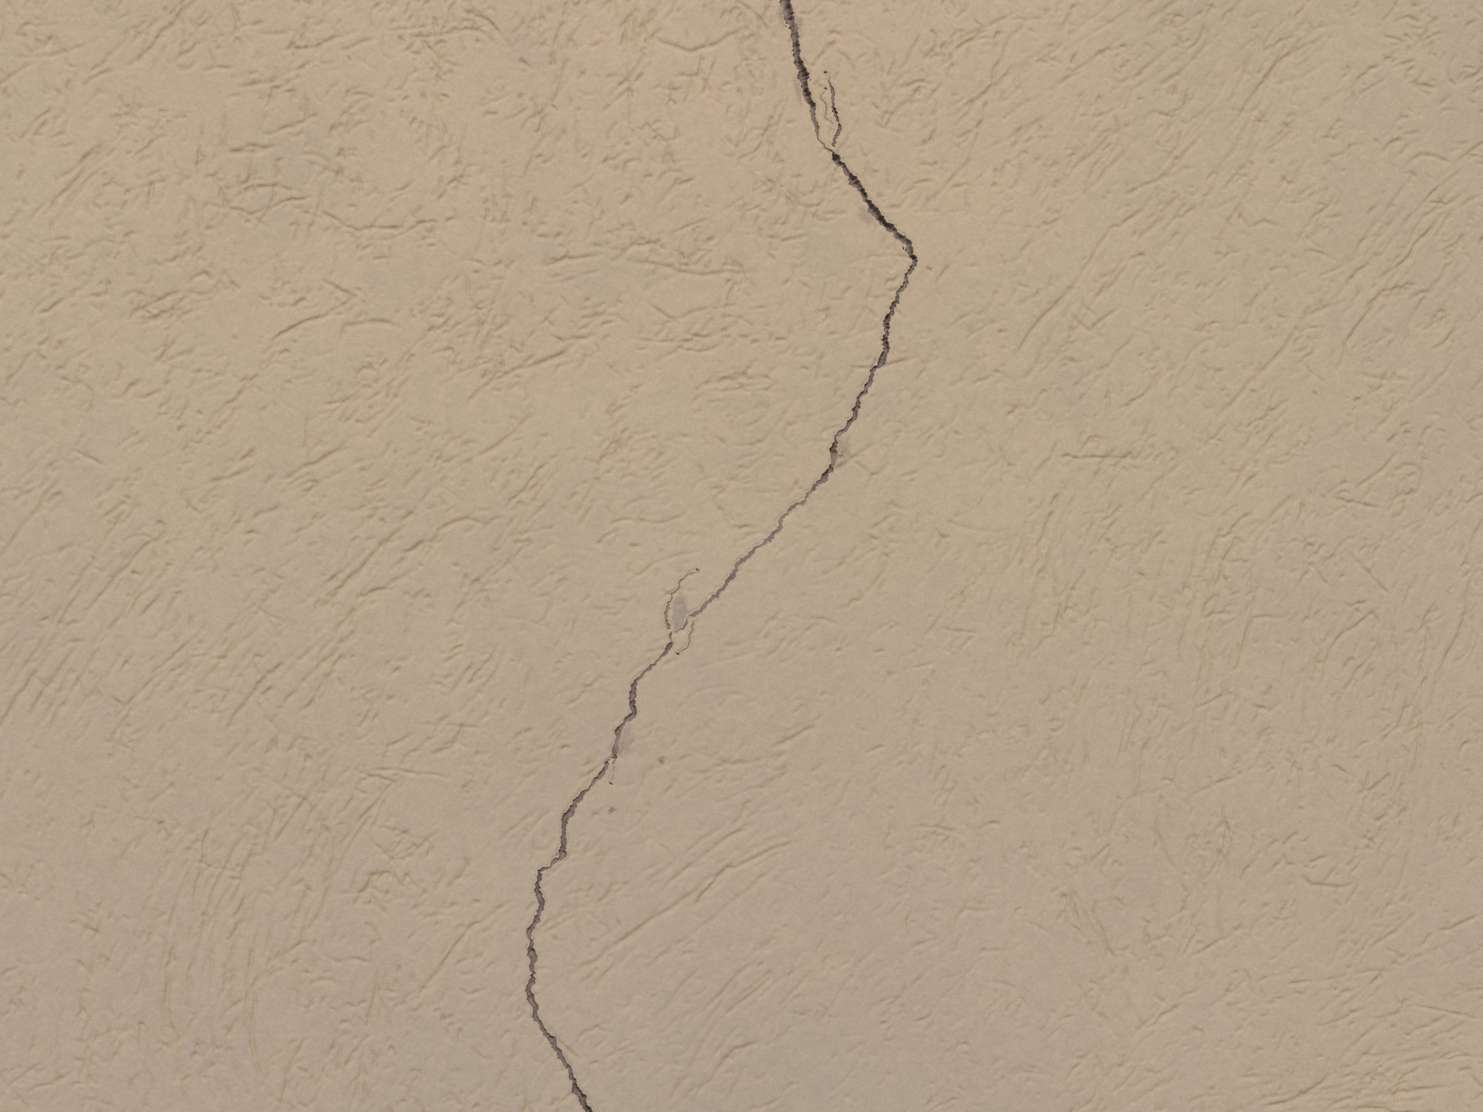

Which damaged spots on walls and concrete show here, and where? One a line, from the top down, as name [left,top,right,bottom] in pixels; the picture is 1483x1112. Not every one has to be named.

crack [523,0,920,1112]